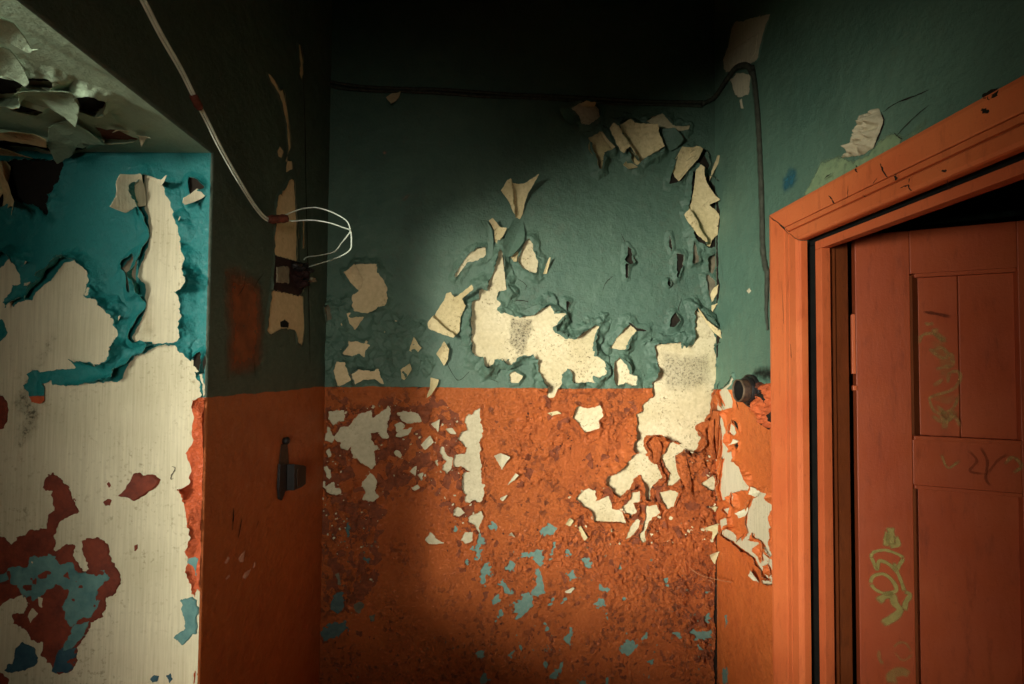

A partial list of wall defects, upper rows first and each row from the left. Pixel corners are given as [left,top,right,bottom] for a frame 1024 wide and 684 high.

peeling [0,18,150,232]
peeling [0,161,211,684]
flaking render [265,70,305,348]
peeling [319,99,772,684]